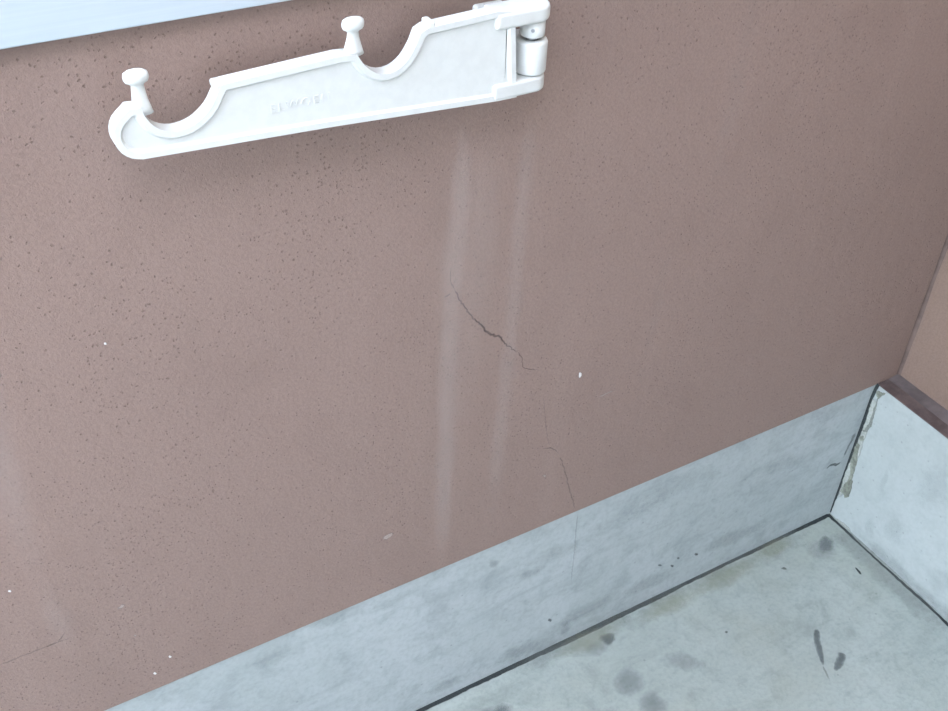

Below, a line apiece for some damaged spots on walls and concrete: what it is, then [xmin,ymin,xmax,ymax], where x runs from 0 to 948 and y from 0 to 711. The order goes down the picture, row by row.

crack [457,293,532,370]
peeling [839,391,885,498]